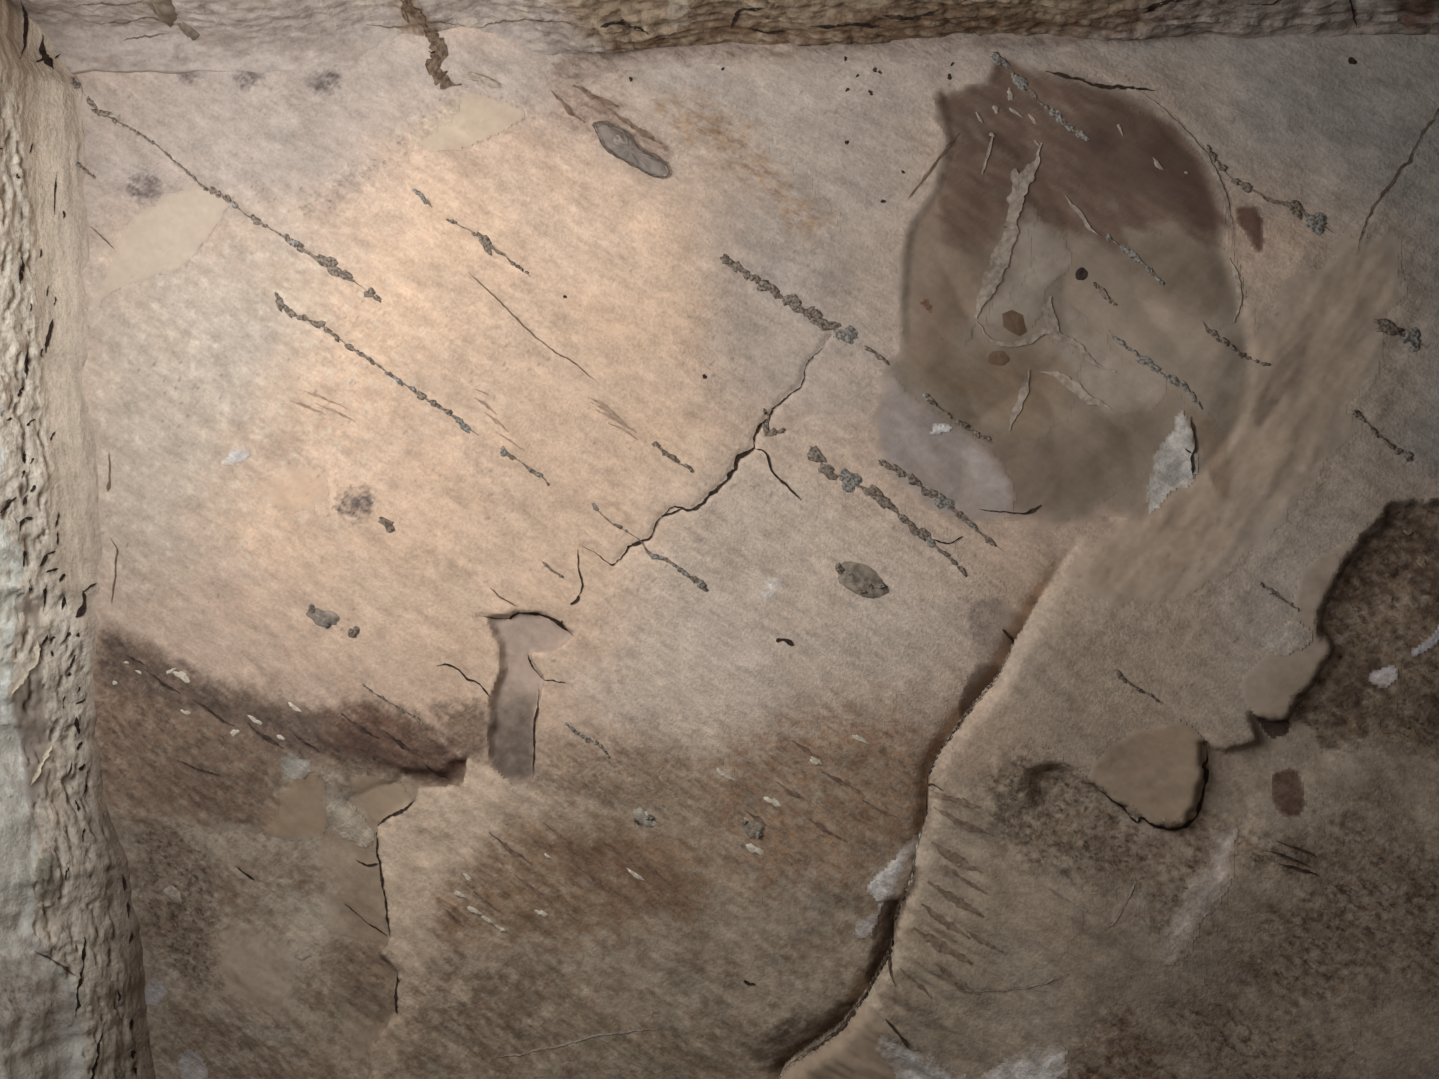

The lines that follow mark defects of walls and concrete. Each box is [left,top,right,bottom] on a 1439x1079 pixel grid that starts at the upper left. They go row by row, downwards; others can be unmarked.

water stain [544,0,1235,444]
crack [484,337,829,635]
crack [934,505,1041,544]
water stain [1146,410,1198,514]
spalling [487,610,573,704]
crack [776,638,794,646]
efflorescence [1369,665,1398,688]
water stain [294,473,1015,1079]
flaking render [1088,719,1209,829]
spalling [1272,766,1306,820]
crack [345,800,415,936]
water stain [872,740,1439,1079]